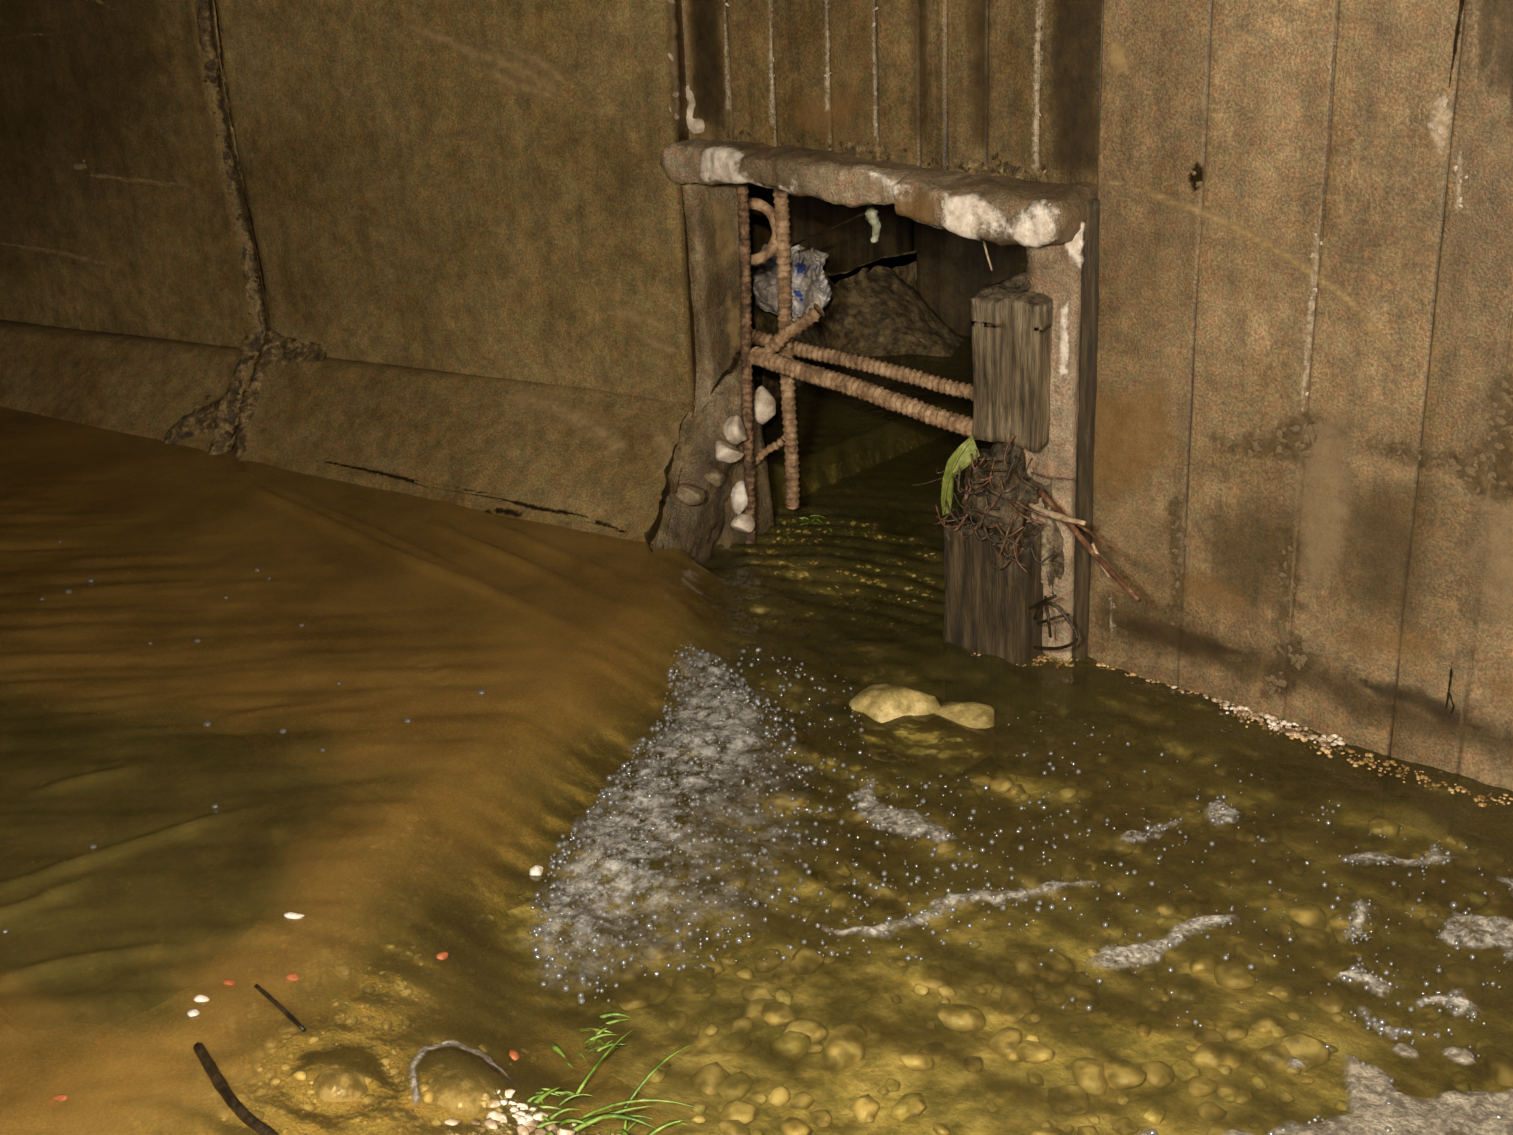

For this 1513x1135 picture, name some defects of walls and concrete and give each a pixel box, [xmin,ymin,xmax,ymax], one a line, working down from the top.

spalling [829,138,910,195]
spalling [922,152,1047,182]
crack [193,0,327,460]
corrosion [897,186,931,224]
peeling [914,193,1084,268]
peeling [1059,304,1069,377]
peeling [506,390,627,455]
spalling [644,294,742,568]
leakage [1104,597,1513,750]